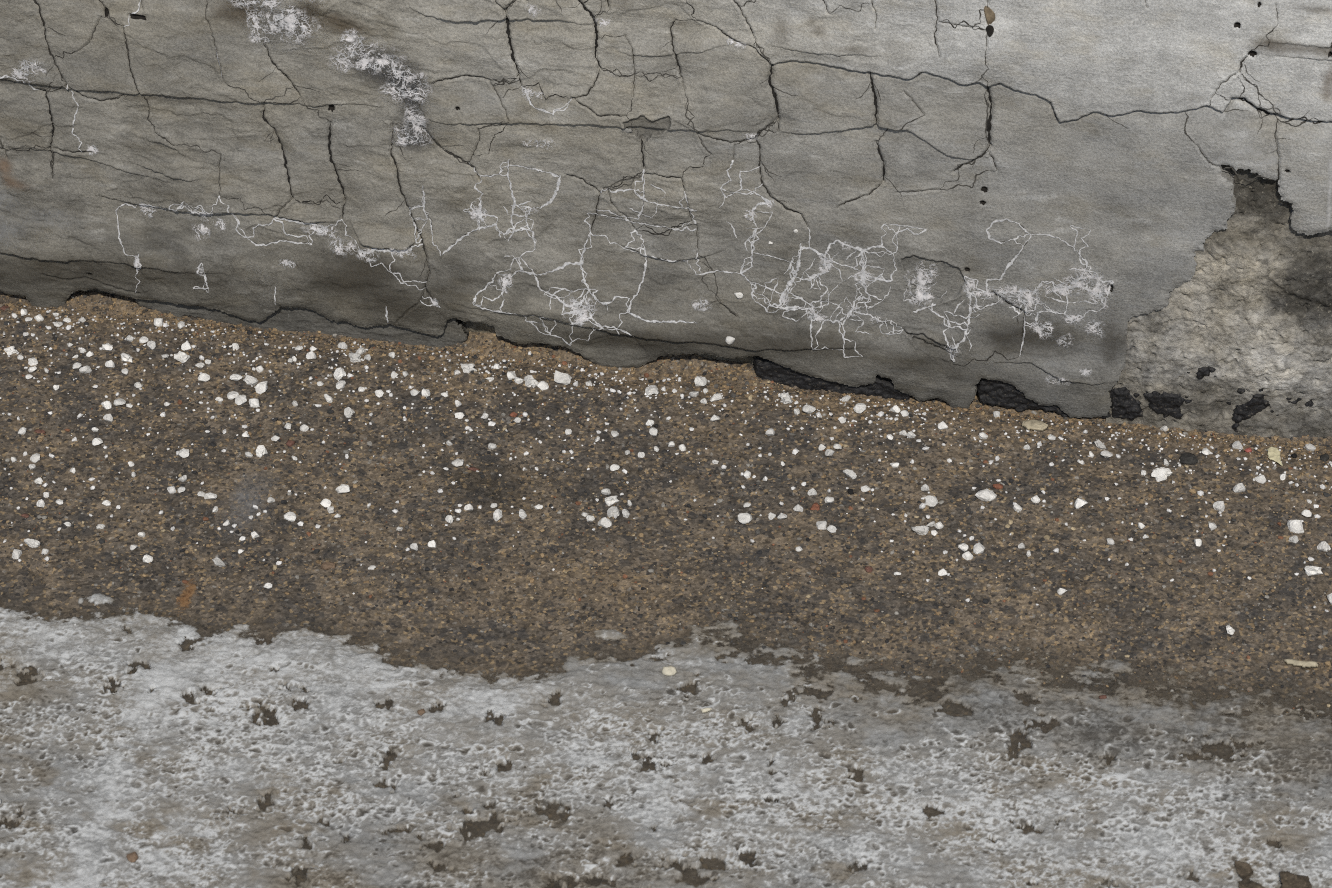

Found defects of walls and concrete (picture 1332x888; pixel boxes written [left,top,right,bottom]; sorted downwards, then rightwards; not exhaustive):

crack [0,0,358,219]
water stain [228,0,429,146]
crack [387,0,808,323]
water stain [116,159,1114,362]
crack [823,0,1000,207]
crack [904,292,1025,366]
crack [1051,8,1324,181]
spalling [1106,165,1332,438]